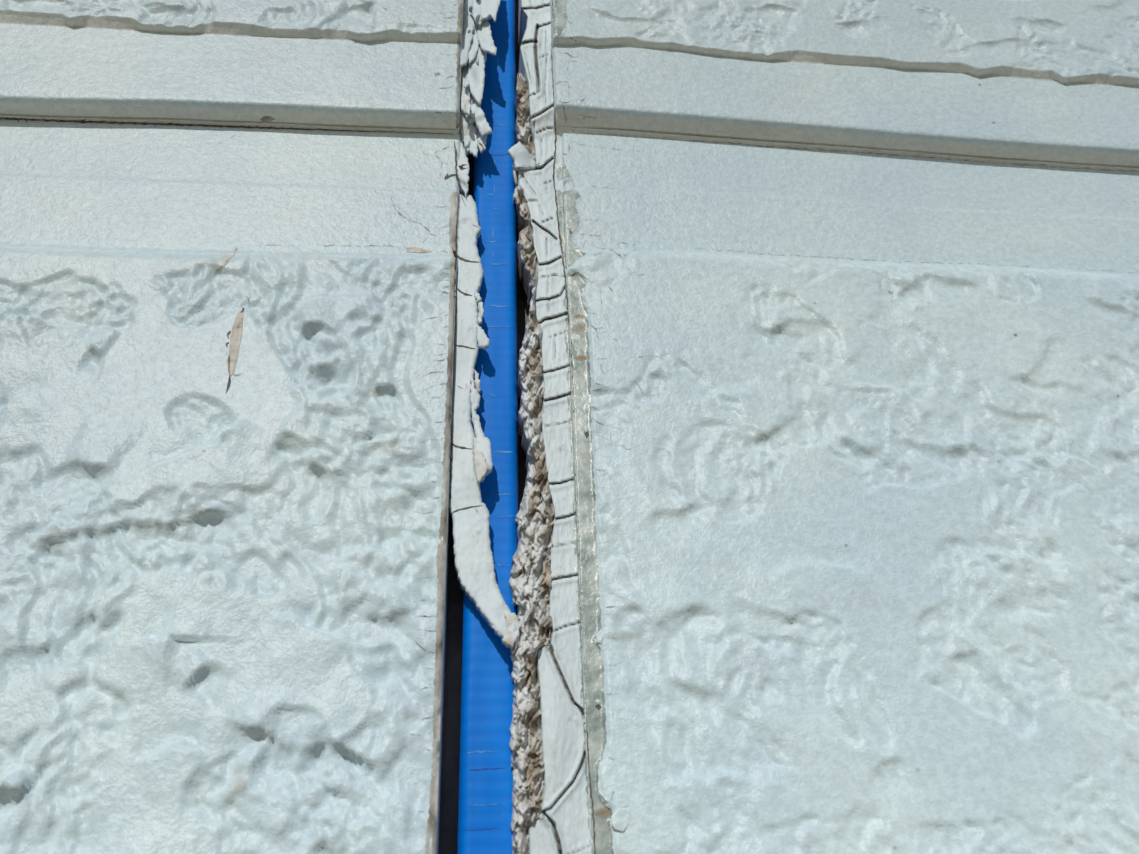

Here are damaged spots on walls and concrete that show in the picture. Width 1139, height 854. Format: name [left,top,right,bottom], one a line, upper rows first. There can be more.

peeling [425,0,501,854]
peeling [552,0,568,38]
crack [516,1,615,854]